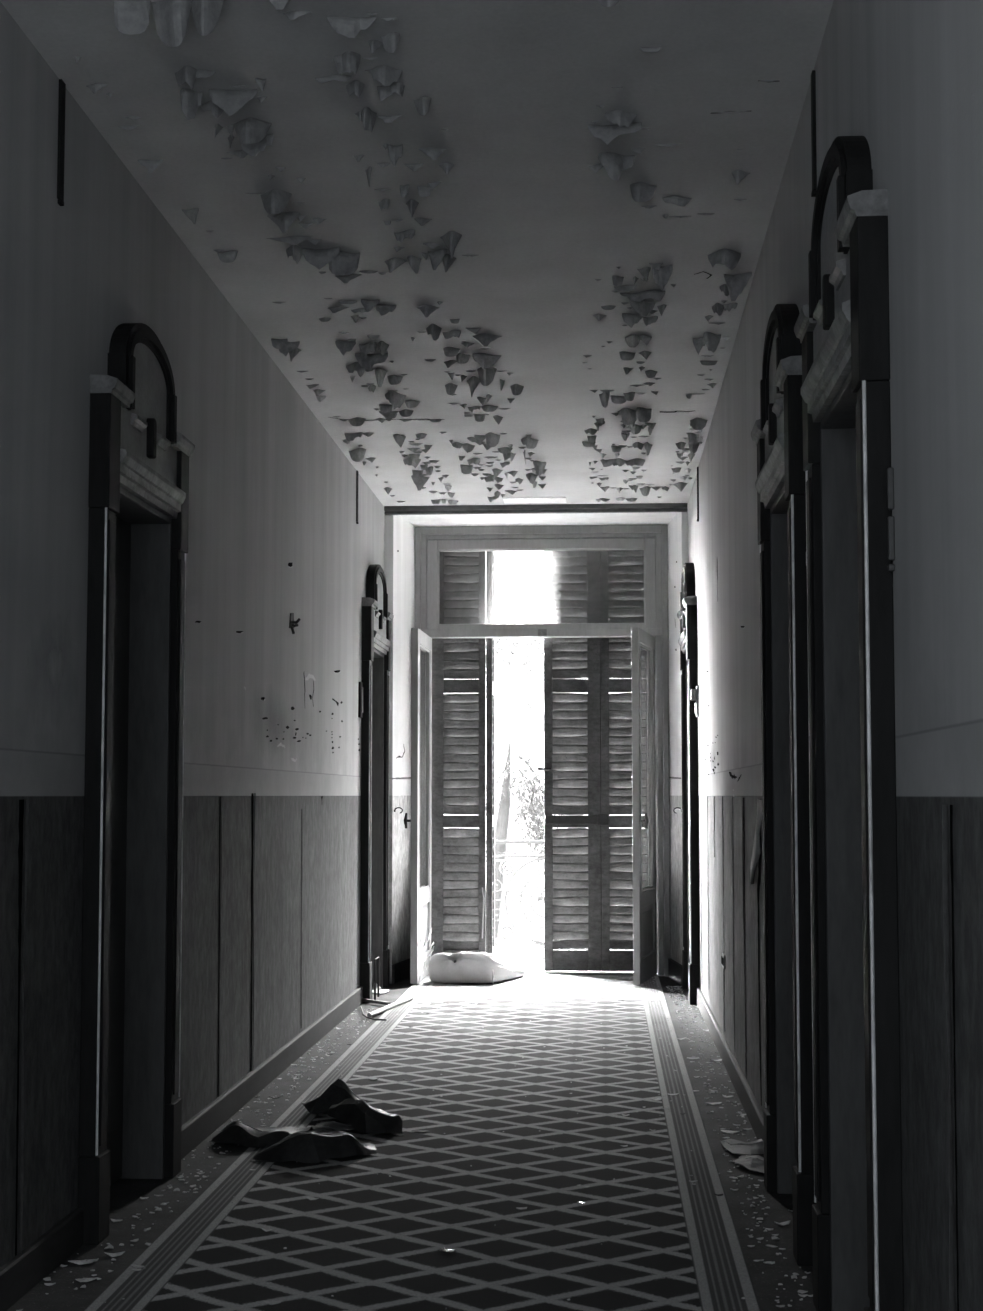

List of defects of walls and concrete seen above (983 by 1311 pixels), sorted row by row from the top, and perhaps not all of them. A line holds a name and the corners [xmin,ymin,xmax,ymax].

peeling [114,0,224,47]
peeling [315,13,432,132]
peeling [245,144,478,283]
peeling [271,339,326,402]
peeling [319,298,547,504]
peeling [582,263,708,502]
peeling [686,249,752,399]